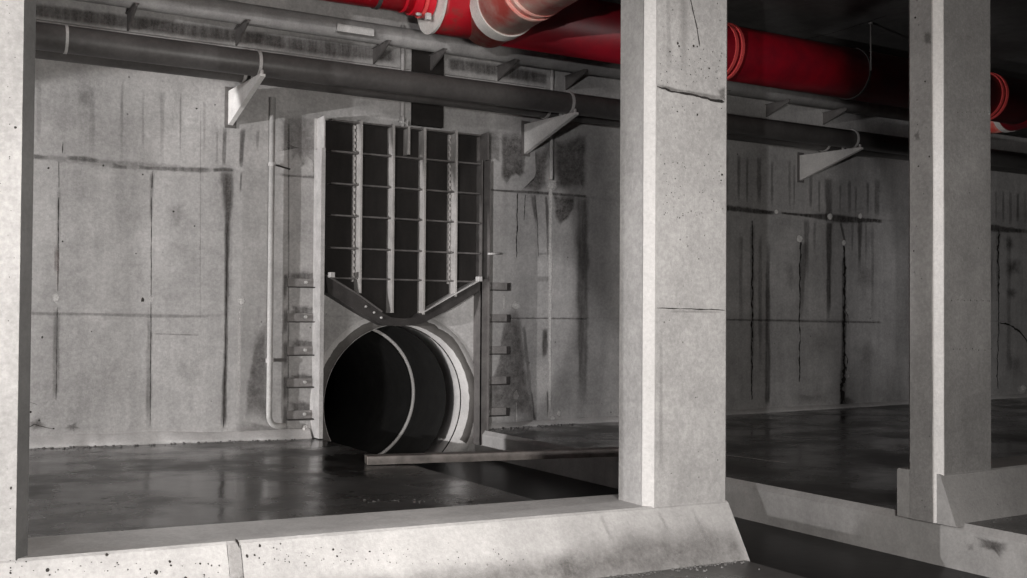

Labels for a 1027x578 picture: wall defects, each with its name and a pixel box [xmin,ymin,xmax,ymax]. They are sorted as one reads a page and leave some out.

crack [657,86,724,103]
water stain [490,137,585,422]
water stain [727,206,880,304]
crack [840,245,849,404]
water stain [991,225,1027,233]
crack [996,230,1027,386]